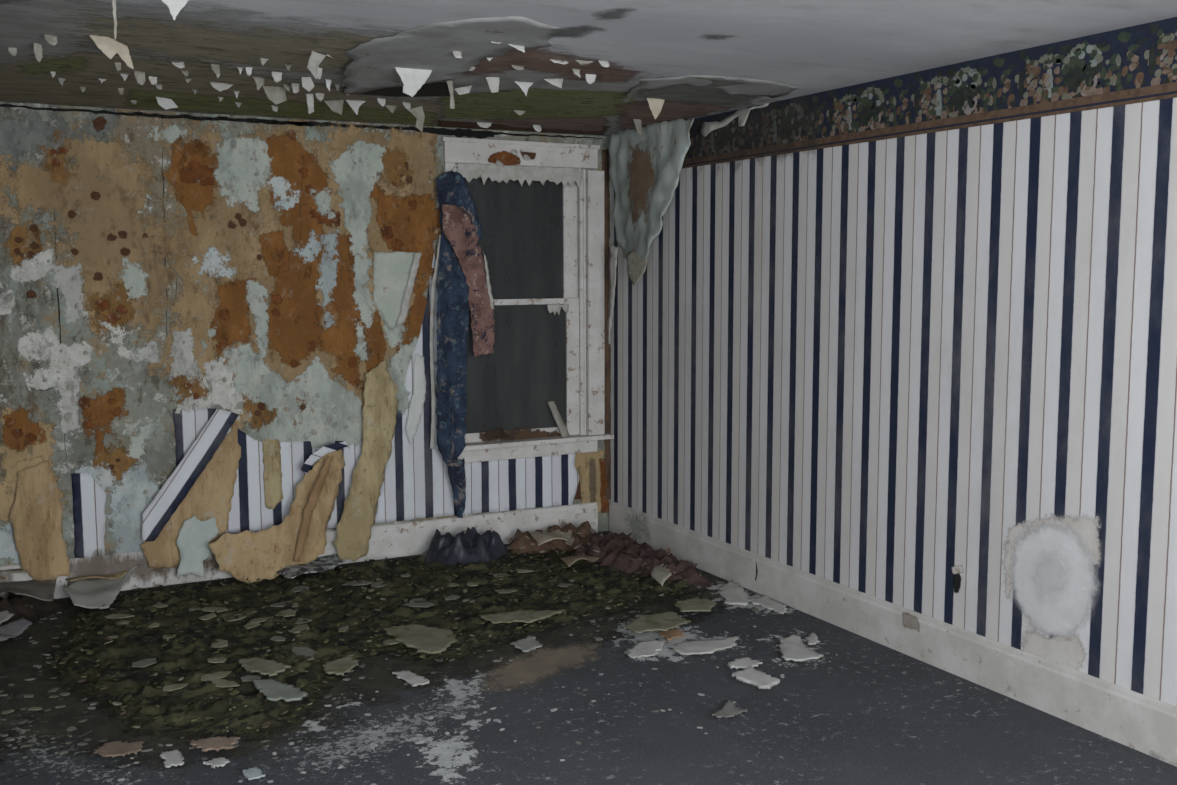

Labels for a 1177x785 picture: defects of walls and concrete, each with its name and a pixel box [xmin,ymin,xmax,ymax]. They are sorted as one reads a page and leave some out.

peeling [89,0,197,147]
peeling [209,51,432,132]
peeling [452,51,500,93]
peeling [490,40,610,97]
peeling [633,98,665,135]
damp [0,364,71,526]
peeling [0,248,94,434]
flaking render [177,515,219,579]
peeling [75,245,364,554]
peeling [212,136,422,416]
damp [0,0,774,416]
damp [589,459,609,513]